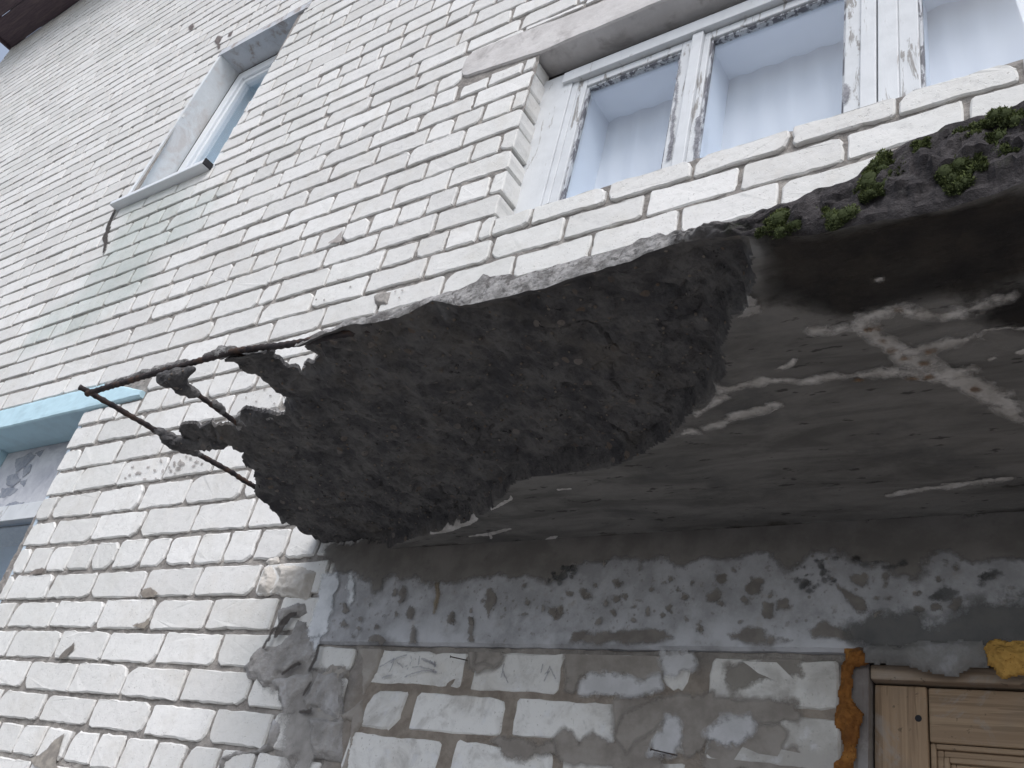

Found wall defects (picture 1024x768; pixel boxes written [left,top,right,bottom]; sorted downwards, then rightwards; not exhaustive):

peeling [665,60,680,161]
peeling [693,116,702,159]
spalling [78,235,761,548]
efflorescence [682,402,782,435]
efflorescence [885,477,1014,497]
leakage [308,511,1024,650]
flaking render [219,557,344,768]